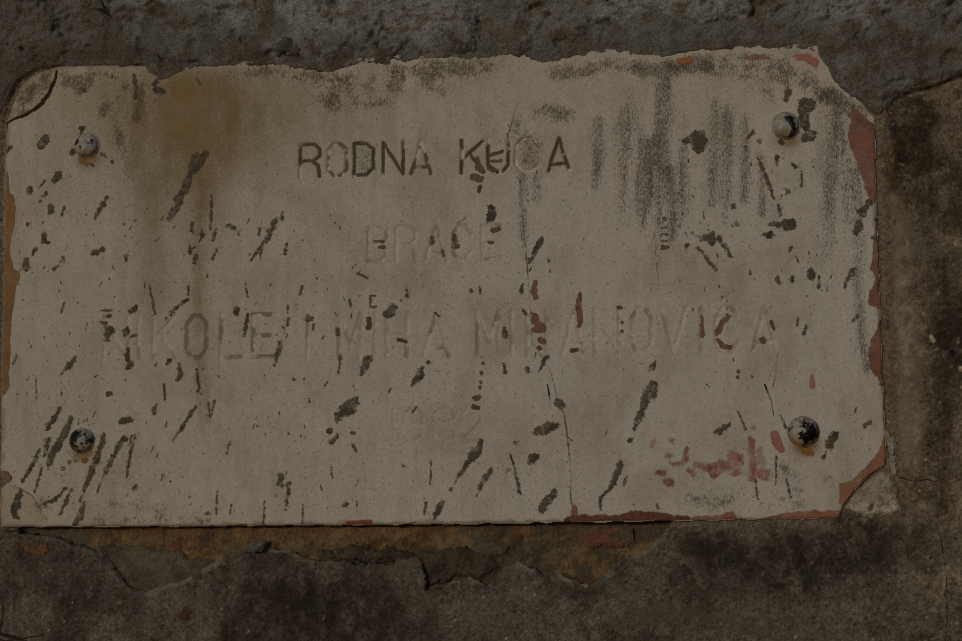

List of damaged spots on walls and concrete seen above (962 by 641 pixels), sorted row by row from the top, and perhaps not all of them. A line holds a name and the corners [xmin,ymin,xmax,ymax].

flaking render [21,505,736,599]